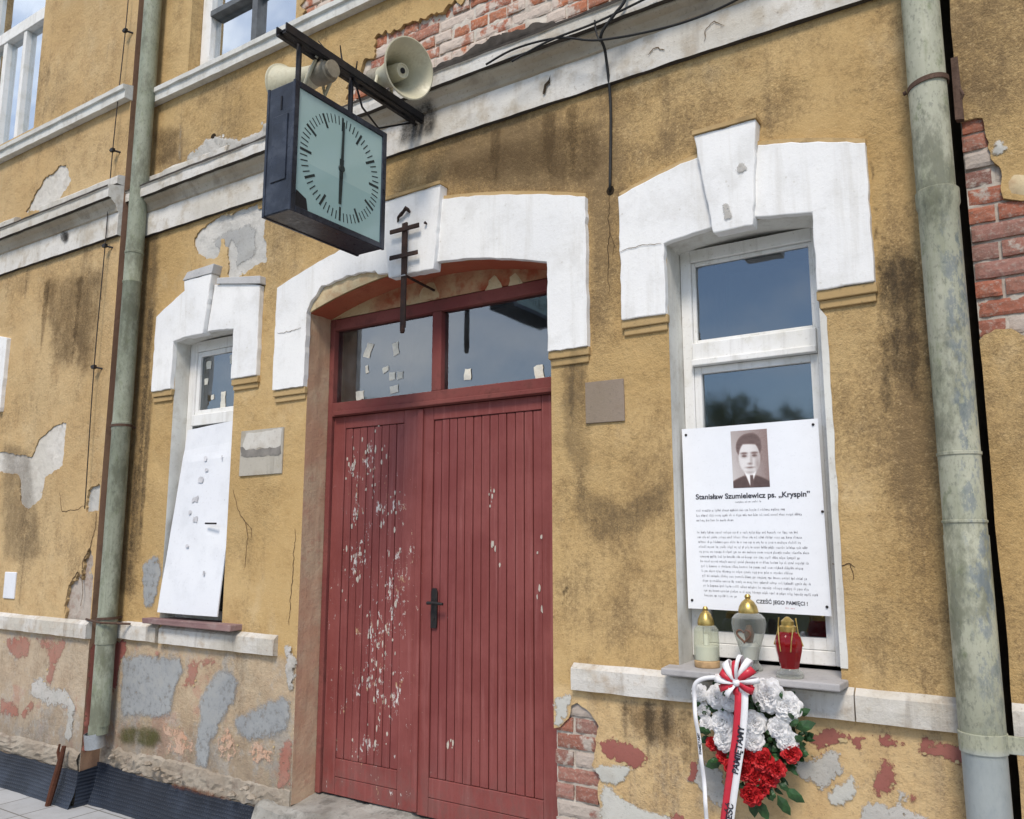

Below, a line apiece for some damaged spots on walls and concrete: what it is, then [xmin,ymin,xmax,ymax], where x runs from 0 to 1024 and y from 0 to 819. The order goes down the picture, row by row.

flaking render [363,0,613,74]
spalling [187,122,266,161]
peeling [27,165,71,213]
peeling [195,204,267,277]
flaking render [961,119,1024,339]
peeling [0,422,66,509]
crack [59,492,97,608]
crack [233,490,252,562]
crack [288,534,296,618]
flaking render [555,703,648,819]
peeling [811,727,905,797]